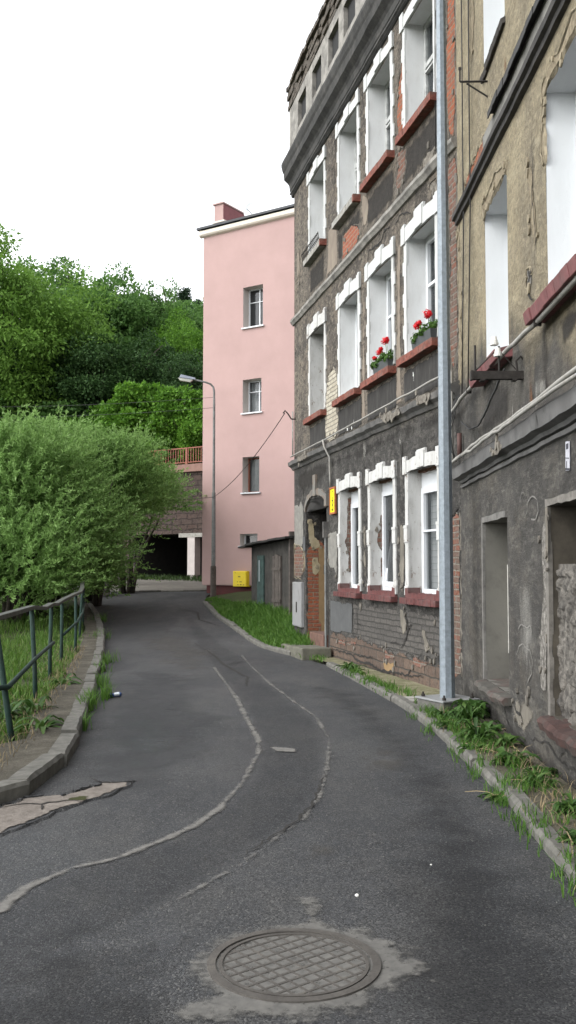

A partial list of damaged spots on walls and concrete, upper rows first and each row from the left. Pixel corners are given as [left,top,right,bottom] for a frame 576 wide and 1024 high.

spalling [482,160,508,221]
spalling [327,195,368,274]
spalling [324,367,339,442]
spalling [294,497,440,690]